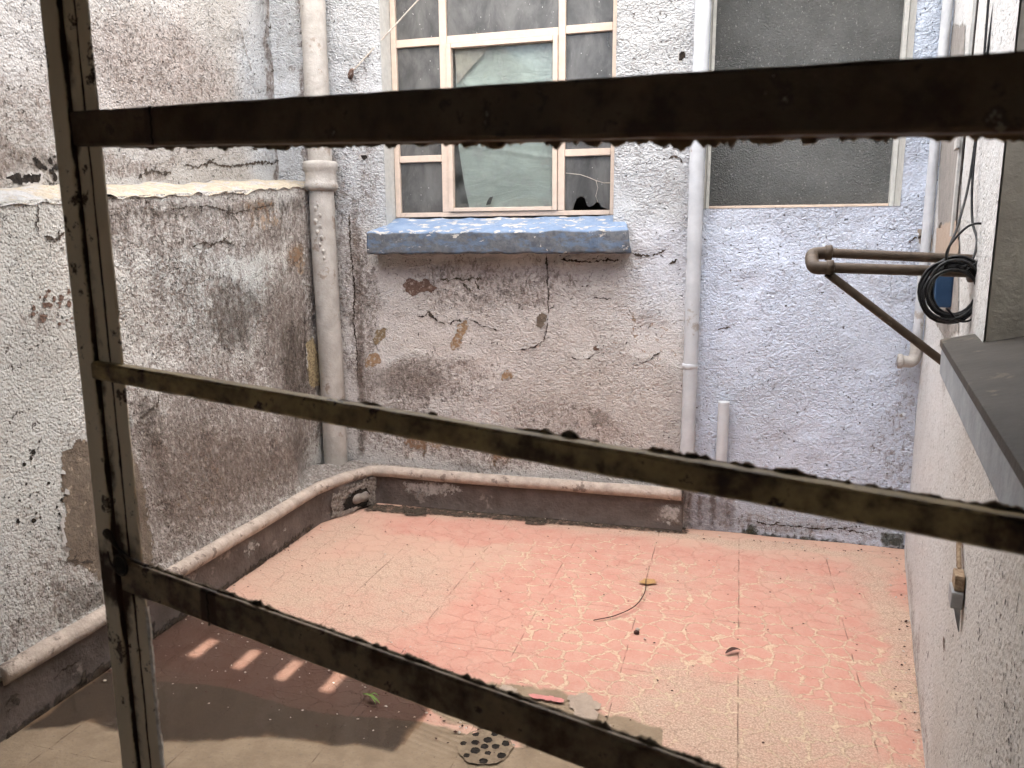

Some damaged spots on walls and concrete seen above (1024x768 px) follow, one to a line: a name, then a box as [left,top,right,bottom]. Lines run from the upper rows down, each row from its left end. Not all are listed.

crack [138,148,279,179]
peeling [403,275,437,296]
crack [418,277,498,331]
crack [521,249,677,350]
peeling [365,325,388,368]
peeling [450,319,470,350]
spalling [16,440,41,524]
peeling [47,439,102,580]
peeling [132,454,154,566]